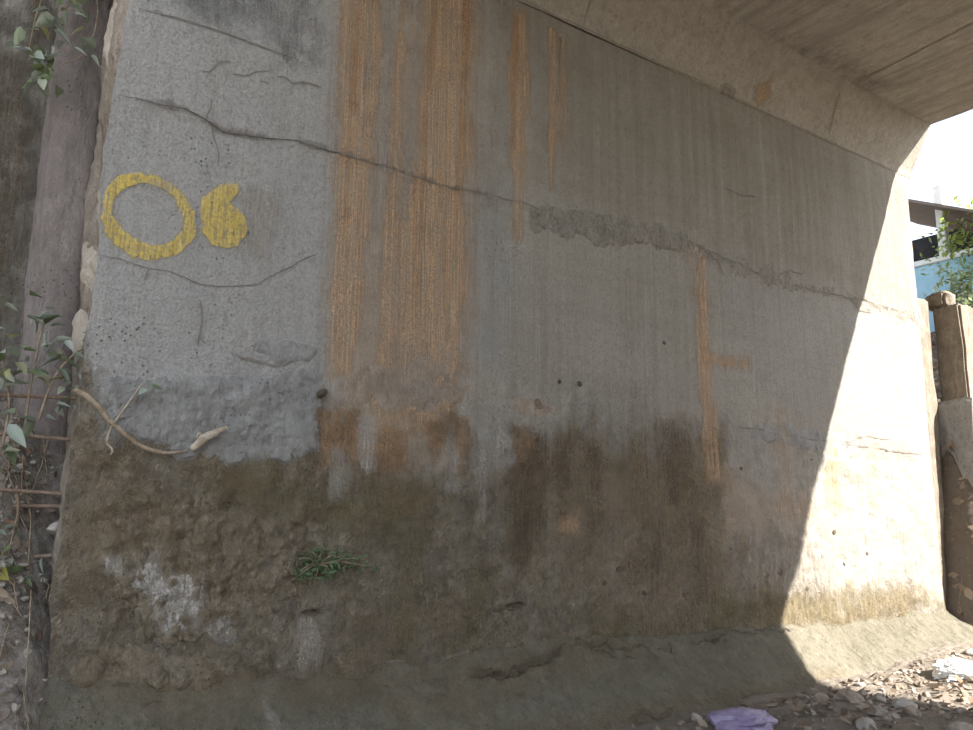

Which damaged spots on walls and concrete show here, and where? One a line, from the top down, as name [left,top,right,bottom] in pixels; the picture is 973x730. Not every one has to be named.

crack [140,8,321,87]
crack [121,95,548,211]
spalling [528,203,695,253]
crack [686,240,918,319]
spalling [846,291,923,339]
corrosion [690,253,815,535]
leakage [105,551,234,641]